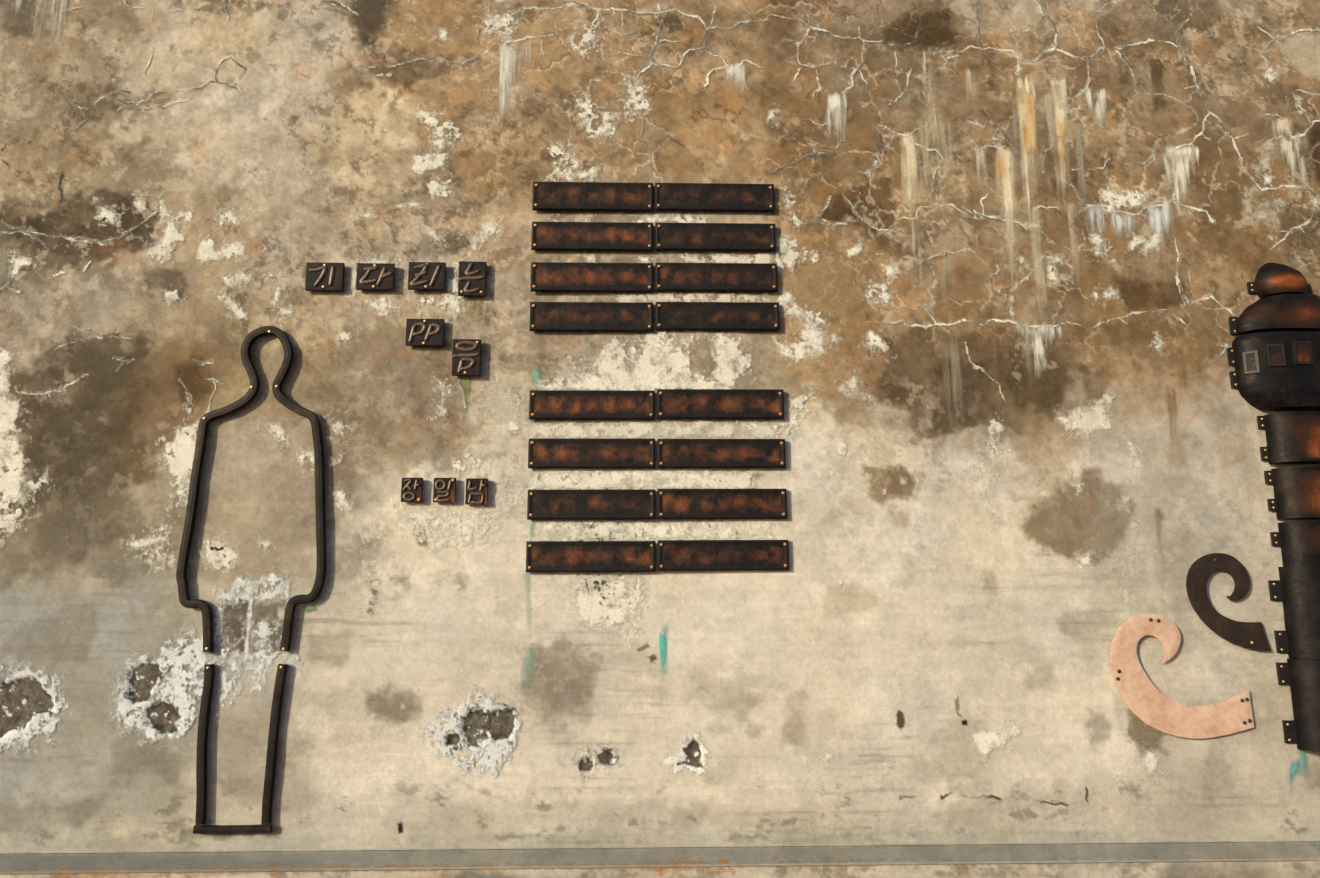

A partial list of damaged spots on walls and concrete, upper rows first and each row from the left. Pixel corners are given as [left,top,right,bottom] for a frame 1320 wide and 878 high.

crack [57,173,65,202]
crack [0,208,160,293]
crack [357,0,1320,399]
damp [888,8,950,203]
corrosion [976,77,1041,282]
corrosion [1050,78,1067,182]
efflorescence [1149,146,1199,234]
efflorescence [1273,95,1306,181]
peeling [0,348,48,546]
spalling [113,535,302,746]
spalling [0,664,69,753]
spalling [418,684,522,778]